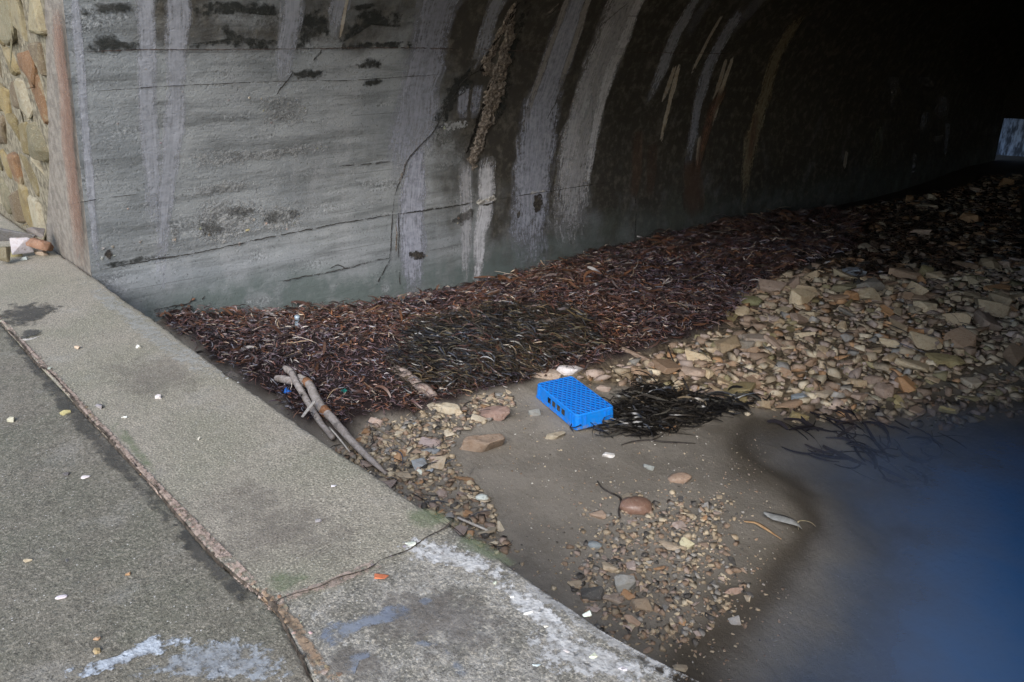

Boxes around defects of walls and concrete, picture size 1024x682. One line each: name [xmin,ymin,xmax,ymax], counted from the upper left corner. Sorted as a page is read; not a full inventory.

damp [72,0,481,285]
crack [88,1,545,284]
damp [511,0,644,259]
damp [652,0,742,165]
damp [0,302,246,601]
crack [0,322,453,679]